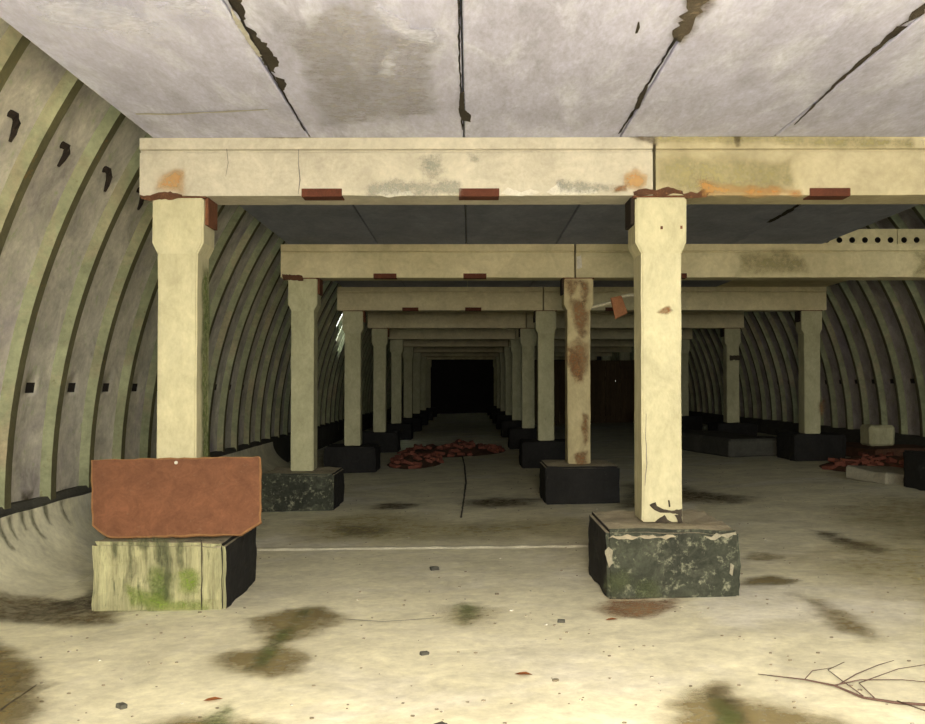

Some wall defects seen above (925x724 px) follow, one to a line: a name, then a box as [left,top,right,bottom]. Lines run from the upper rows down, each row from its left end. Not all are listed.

crack [228,0,305,194]
crack [457,0,471,130]
corrosion [161,172,181,188]
corrosion [615,172,644,192]
corrosion [567,280,588,381]
damp [128,538,183,584]
damp [217,607,340,676]
damp [0,648,36,724]
damp [674,687,841,724]